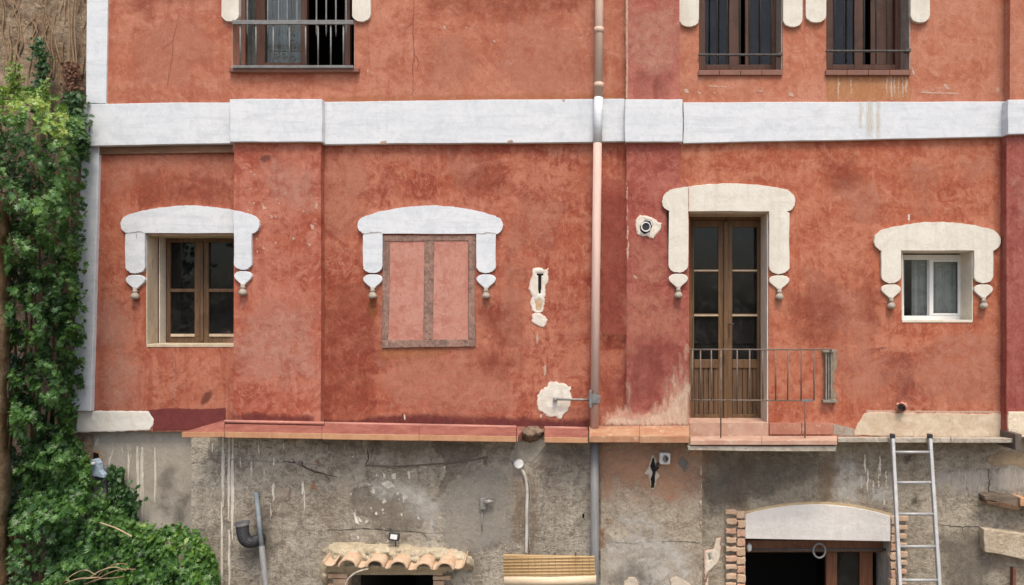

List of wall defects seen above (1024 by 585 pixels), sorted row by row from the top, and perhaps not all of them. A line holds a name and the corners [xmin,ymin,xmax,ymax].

crack [408,3,419,93]
corrosion [827,76,910,101]
spalling [528,267,549,341]
spalling [519,365,572,443]
peeling [603,346,690,426]
leakage [108,443,157,524]
leakage [149,391,311,585]
crack [283,459,336,483]
hole [644,455,660,489]